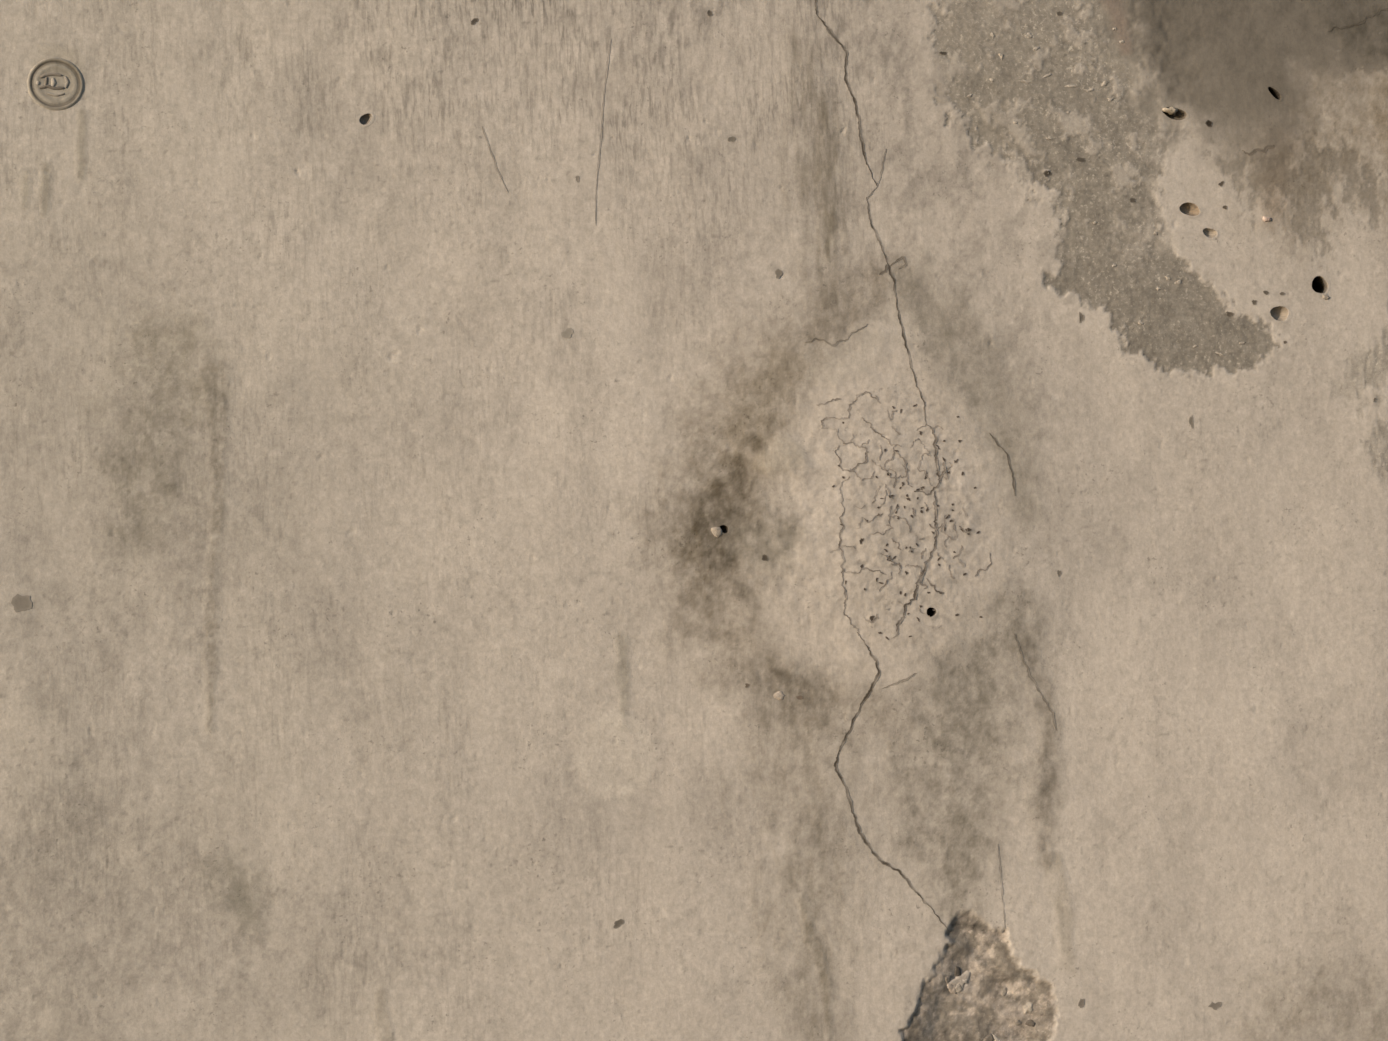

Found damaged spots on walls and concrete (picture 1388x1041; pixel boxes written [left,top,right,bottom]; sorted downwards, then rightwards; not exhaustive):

leakage [609,22,1080,1041]
crack [805,0,1016,931]
peeling [903,0,1388,583]
leakage [1105,0,1388,183]
spalling [898,908,1060,1041]